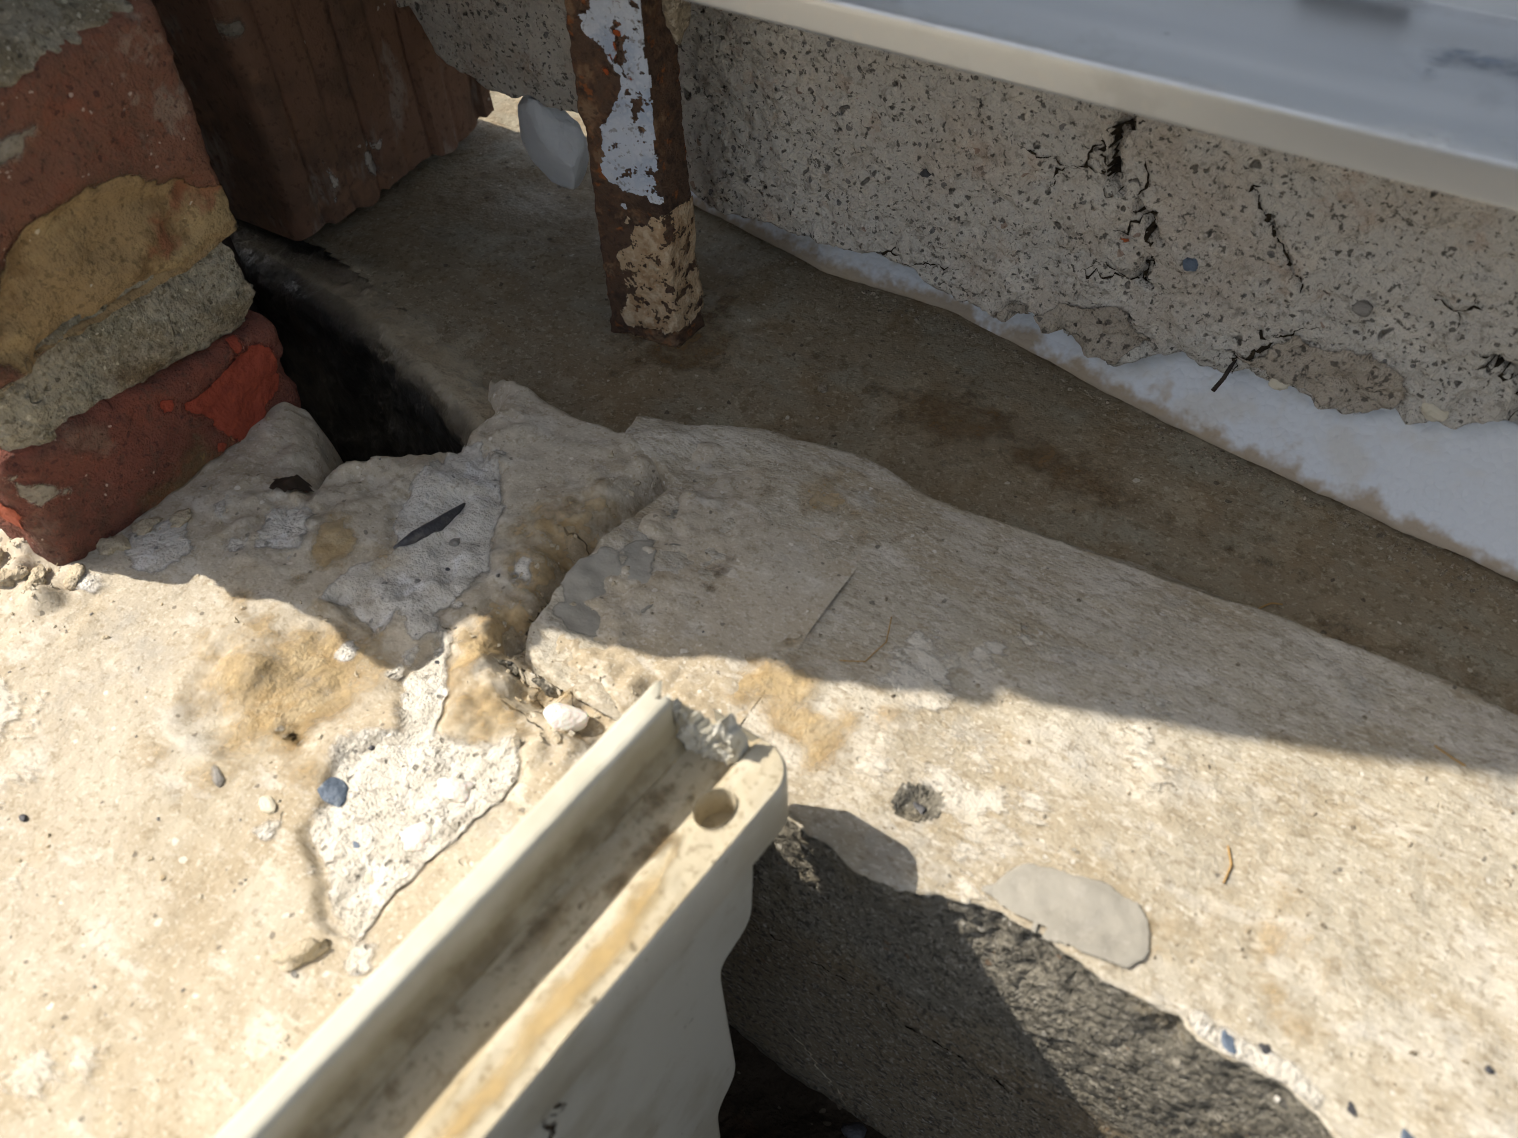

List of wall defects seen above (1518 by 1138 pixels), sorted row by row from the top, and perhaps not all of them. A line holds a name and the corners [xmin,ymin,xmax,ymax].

spalling [509,557,531,584]
spalling [308,442,519,975]
spalling [891,780,946,822]
spalling [252,821,279,840]
spalling [1187,1010,1323,1109]